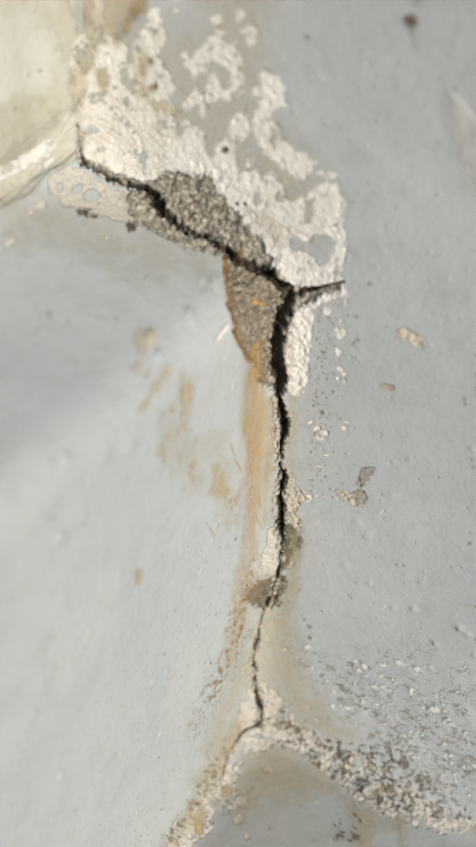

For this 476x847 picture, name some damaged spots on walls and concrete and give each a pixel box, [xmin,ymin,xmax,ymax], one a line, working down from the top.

peeling [0,0,349,397]
crack [77,128,343,776]
peeling [307,420,328,441]
peeling [162,645,476,847]